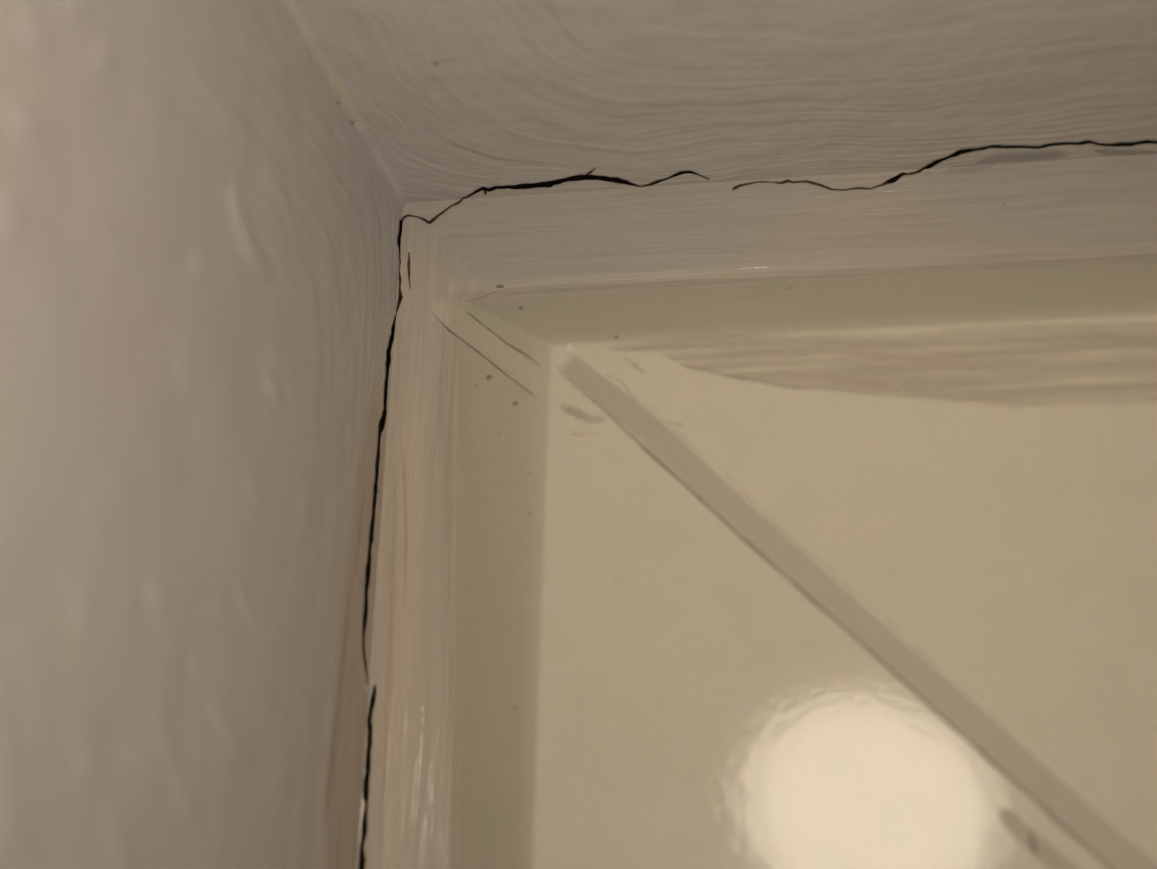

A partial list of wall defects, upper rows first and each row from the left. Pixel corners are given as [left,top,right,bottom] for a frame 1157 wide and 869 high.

crack [358,140,1157,869]